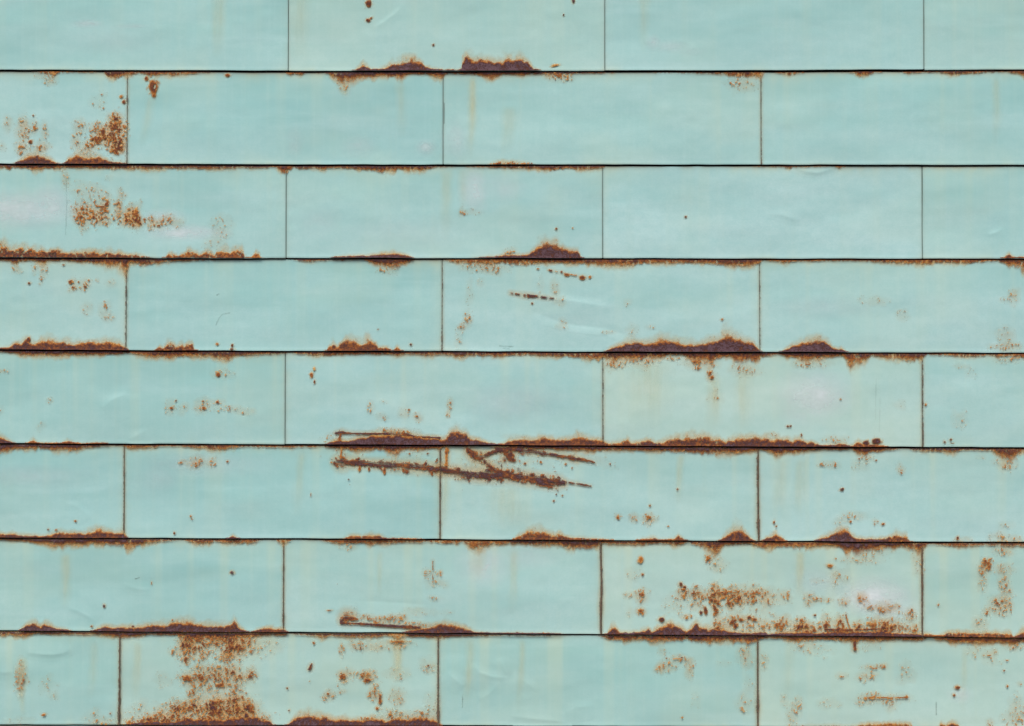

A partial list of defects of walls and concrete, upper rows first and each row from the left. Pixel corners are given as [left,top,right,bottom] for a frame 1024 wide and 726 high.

corrosion [325,57,614,89]
corrosion [0,94,452,232]
corrosion [0,244,280,377]
corrosion [451,242,1024,282]
corrosion [294,313,1024,469]
corrosion [0,409,1024,726]